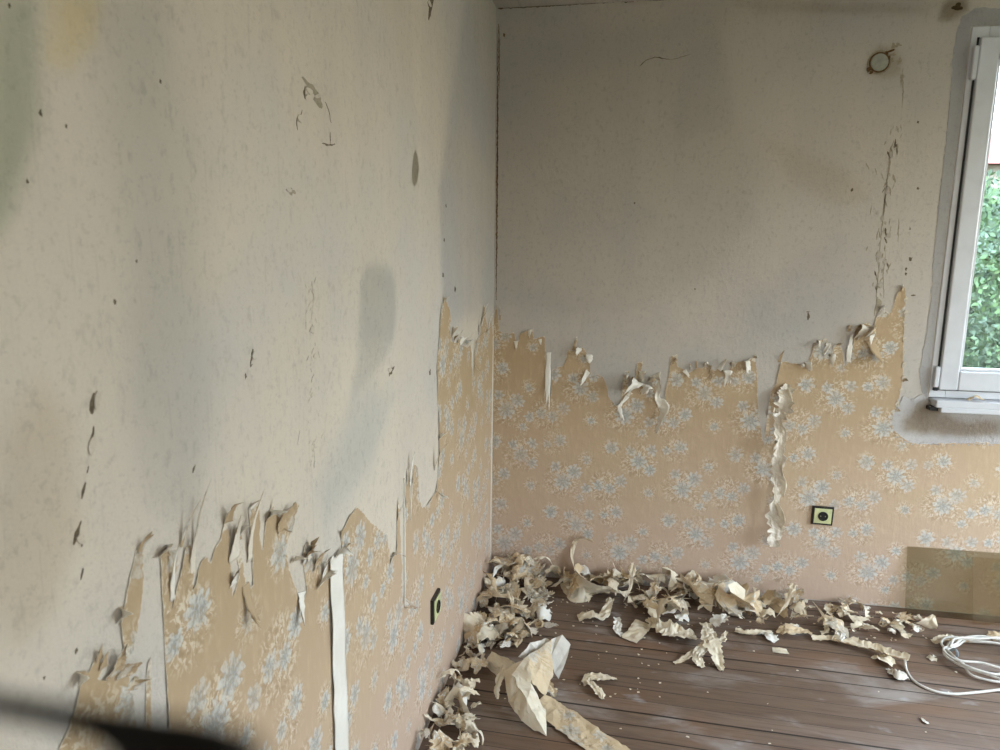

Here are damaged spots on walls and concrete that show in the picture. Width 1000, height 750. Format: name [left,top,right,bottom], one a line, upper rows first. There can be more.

crack [866,70,904,316]